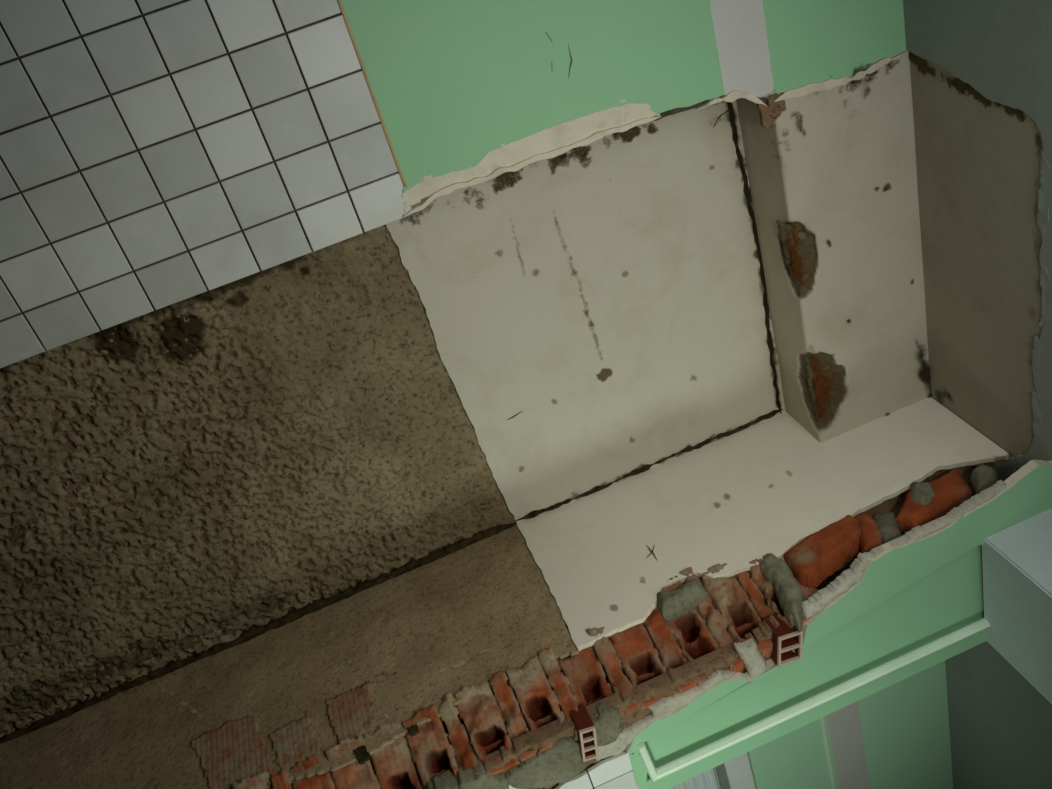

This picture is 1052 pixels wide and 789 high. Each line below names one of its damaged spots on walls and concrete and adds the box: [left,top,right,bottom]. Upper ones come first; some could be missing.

damp [493,168,523,194]
flaking render [401,99,661,217]
damp [548,146,591,174]
damp [612,124,658,142]
spalling [776,219,810,286]
damp [148,244,310,360]
damp [90,320,138,359]
crack [0,102,783,743]
spalling [231,464,1006,789]